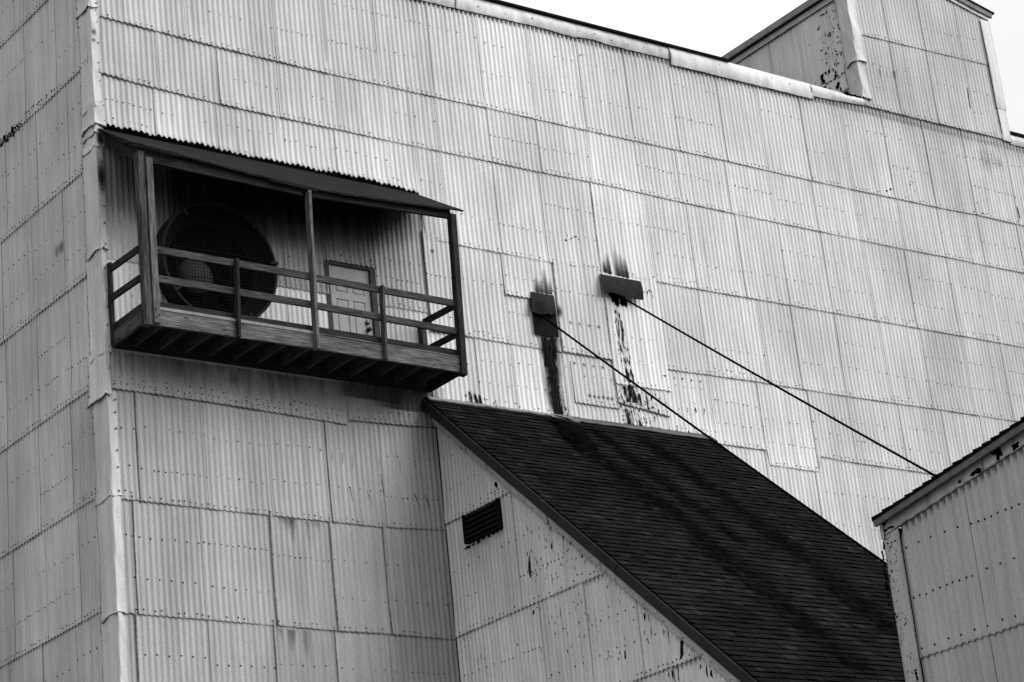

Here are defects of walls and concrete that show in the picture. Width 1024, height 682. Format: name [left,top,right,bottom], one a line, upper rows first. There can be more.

peeling [817,10,844,84]
rust [541,337,569,415]
rust [614,306,635,383]
peeling [527,527,589,581]